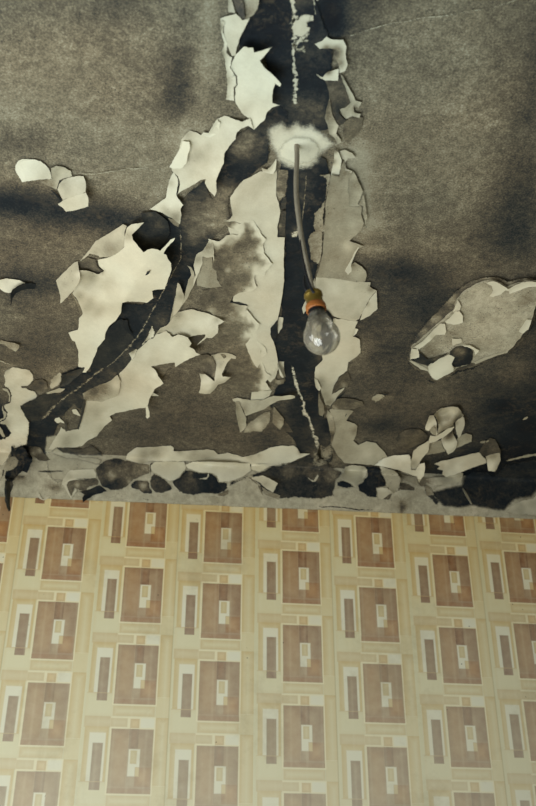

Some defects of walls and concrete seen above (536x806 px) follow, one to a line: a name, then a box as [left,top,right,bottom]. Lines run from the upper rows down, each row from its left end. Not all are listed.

crack [290,0,314,104]
crack [350,0,516,36]
peeling [0,0,501,511]
crack [42,231,182,419]
spalling [406,277,536,383]
crack [292,368,333,470]
leakage [433,459,536,510]
crack [507,453,536,461]
peeling [508,496,536,516]